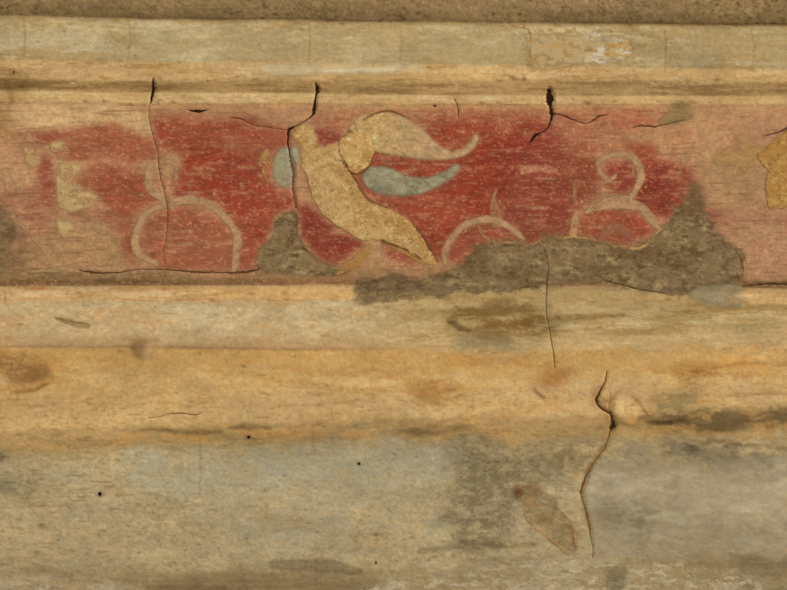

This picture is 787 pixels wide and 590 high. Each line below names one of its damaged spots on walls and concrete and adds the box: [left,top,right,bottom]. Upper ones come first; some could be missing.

crack [79,79,260,274]
crack [230,83,320,208]
crack [530,88,608,143]
spalling [256,209,347,277]
spalling [355,194,745,304]
crack [580,372,617,558]